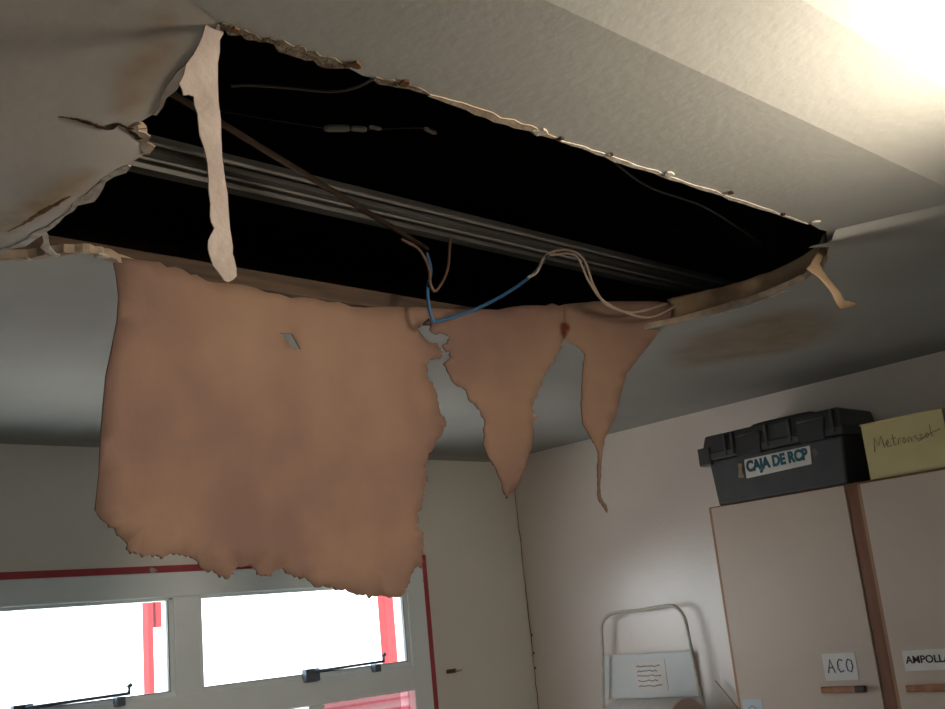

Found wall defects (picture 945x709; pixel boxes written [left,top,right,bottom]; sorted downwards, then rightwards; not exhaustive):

crack [58,116,147,140]
spalling [129,122,156,154]
peeling [153,22,361,283]
spalling [373,76,821,225]
spalling [0,165,131,263]